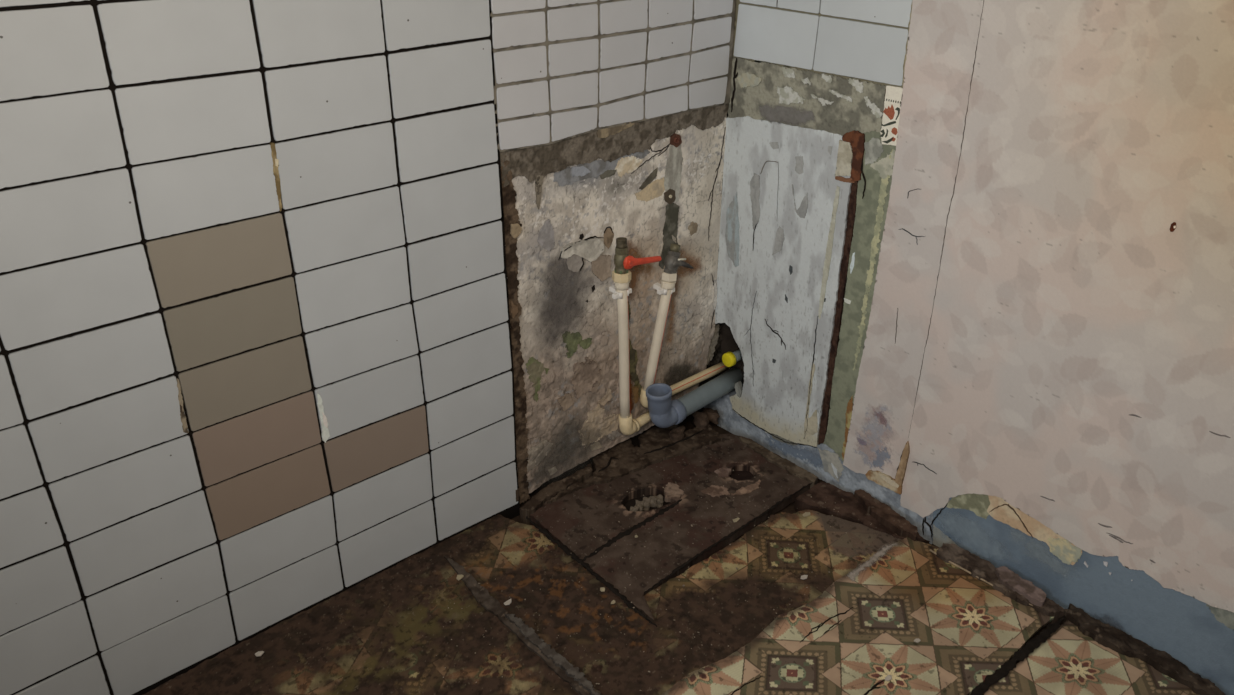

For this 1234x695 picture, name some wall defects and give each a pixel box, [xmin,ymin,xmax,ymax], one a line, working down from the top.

damp [543,257,579,340]
crack [708,58,738,241]
corrosion [818,130,866,445]
peeling [500,57,1234,695]